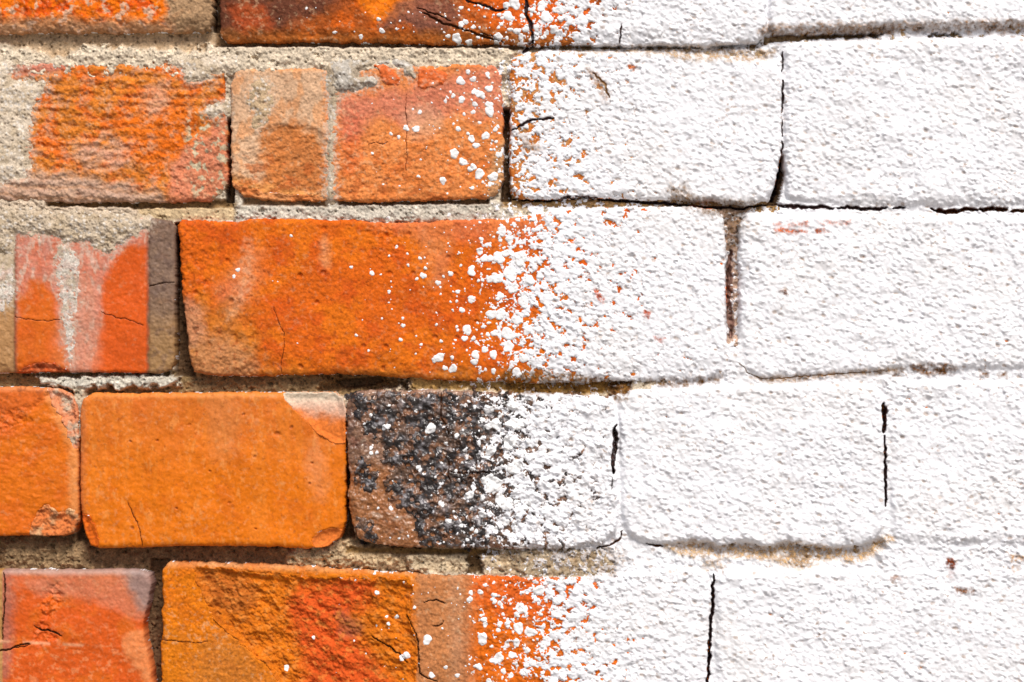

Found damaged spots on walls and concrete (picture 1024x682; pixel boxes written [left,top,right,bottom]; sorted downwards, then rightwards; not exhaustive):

crack [419,0,534,53]
crack [610,425,618,487]
crack [880,403,888,507]
crack [706,574,715,682]